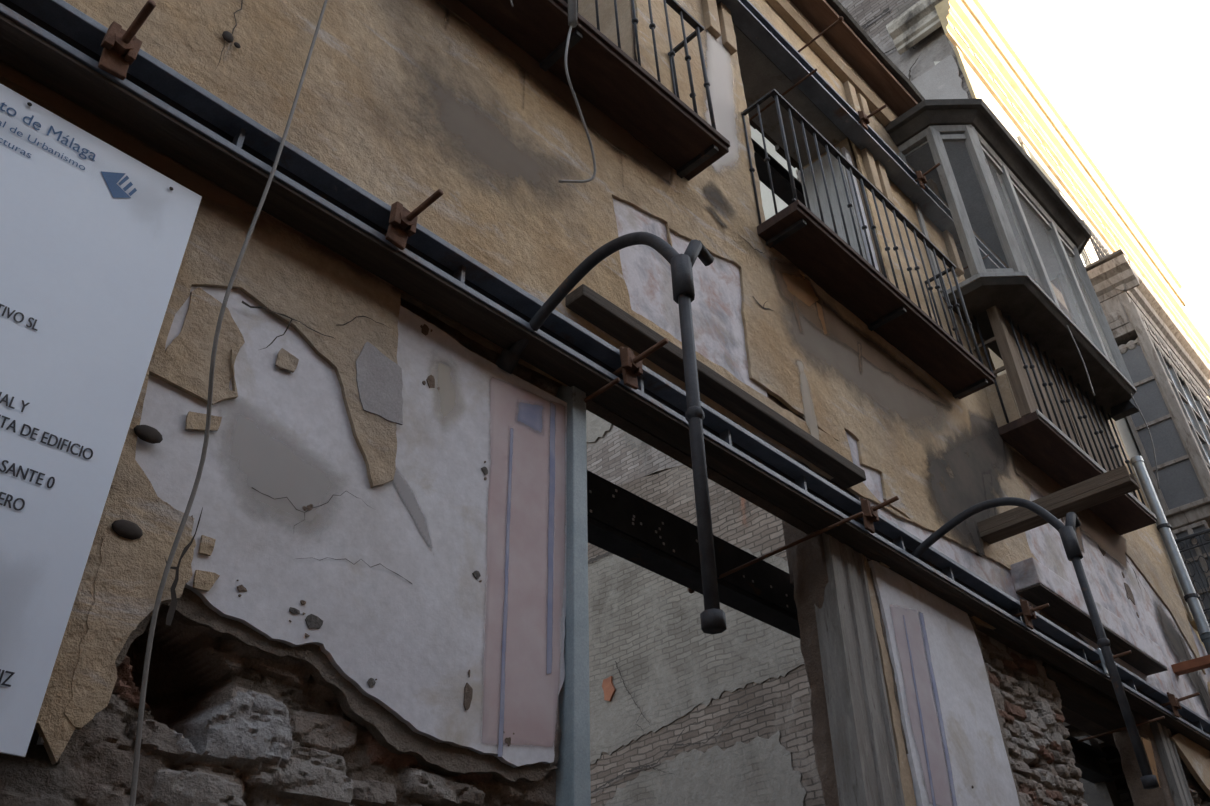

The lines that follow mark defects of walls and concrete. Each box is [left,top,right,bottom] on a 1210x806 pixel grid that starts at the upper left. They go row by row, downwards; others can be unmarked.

crack [215,0,243,70]
peeling [165,287,245,389]
peeling [275,348,299,373]
peeling [356,341,403,425]
spalling [422,375,440,390]
damp [786,304,943,440]
damp [927,412,1064,556]
damp [1075,508,1127,570]
peeling [64,500,239,755]
spalling [289,600,323,637]
spalling [463,670,473,710]
spalling [1023,755,1049,770]